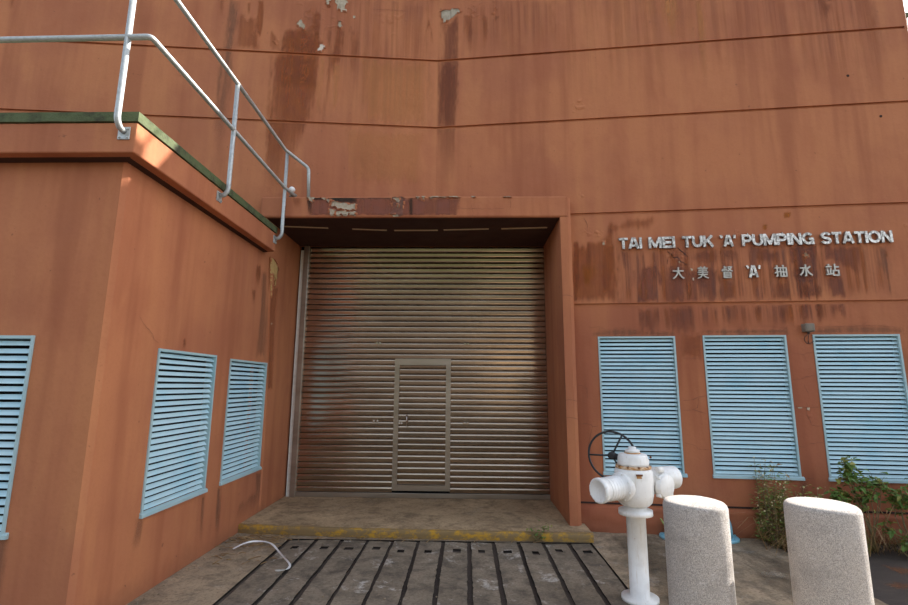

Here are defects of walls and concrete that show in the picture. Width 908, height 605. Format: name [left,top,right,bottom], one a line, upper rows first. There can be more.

peeling [324,0,355,30]
peeling [439,7,462,23]
damp [441,20,457,115]
peeling [306,197,358,216]
damp [626,250,734,301]
damp [750,245,867,317]